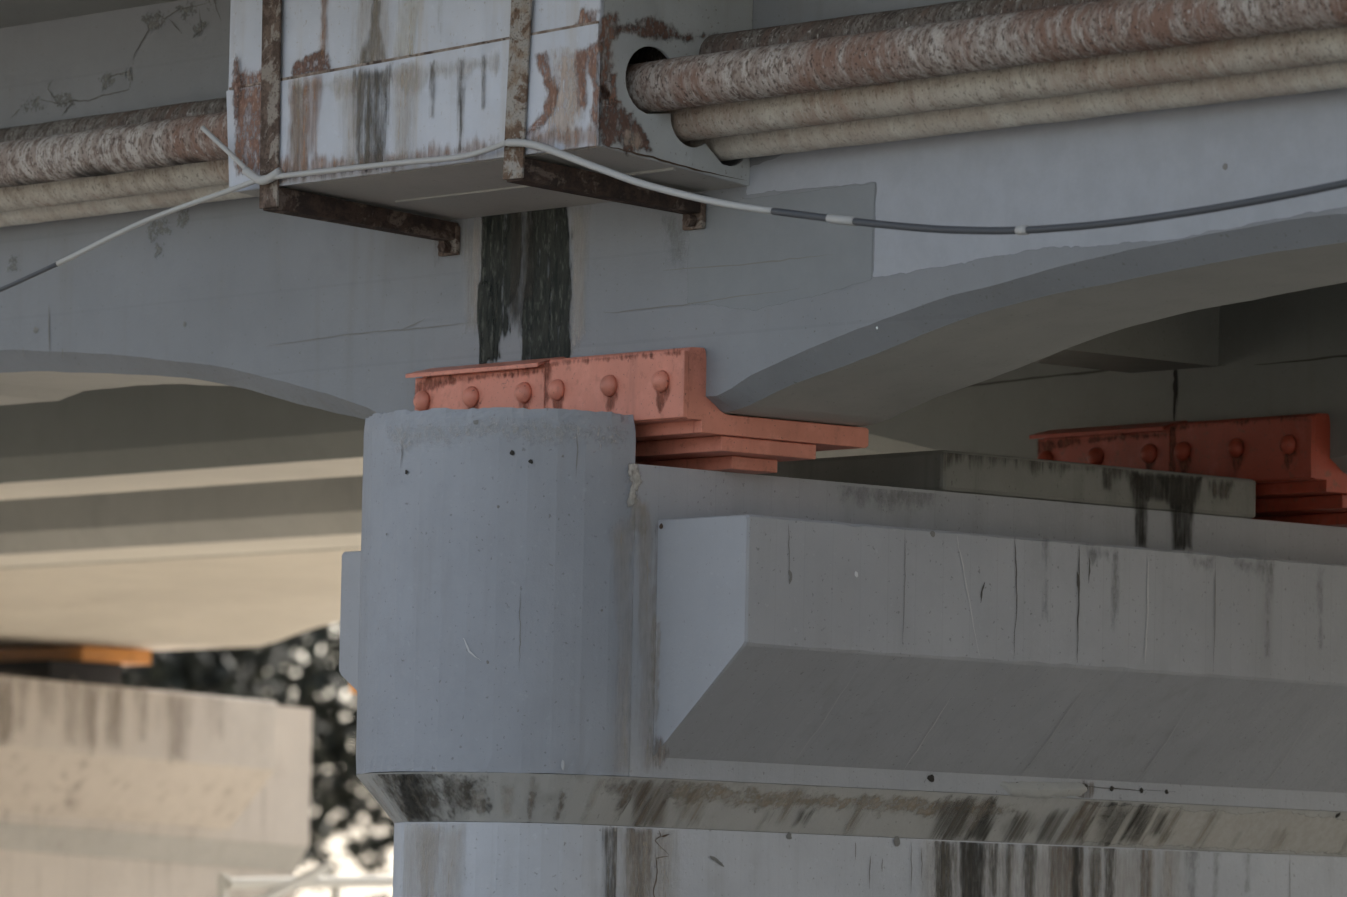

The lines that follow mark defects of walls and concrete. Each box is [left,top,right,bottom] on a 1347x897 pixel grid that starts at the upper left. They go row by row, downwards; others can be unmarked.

rust [232,57,261,174]
rust [280,0,363,181]
rust [526,8,705,146]
damp [477,207,573,364]
damp [1129,472,1232,549]
damp [365,774,492,822]
damp [605,783,670,897]
crack [653,831,670,897]
damp [935,797,1178,897]